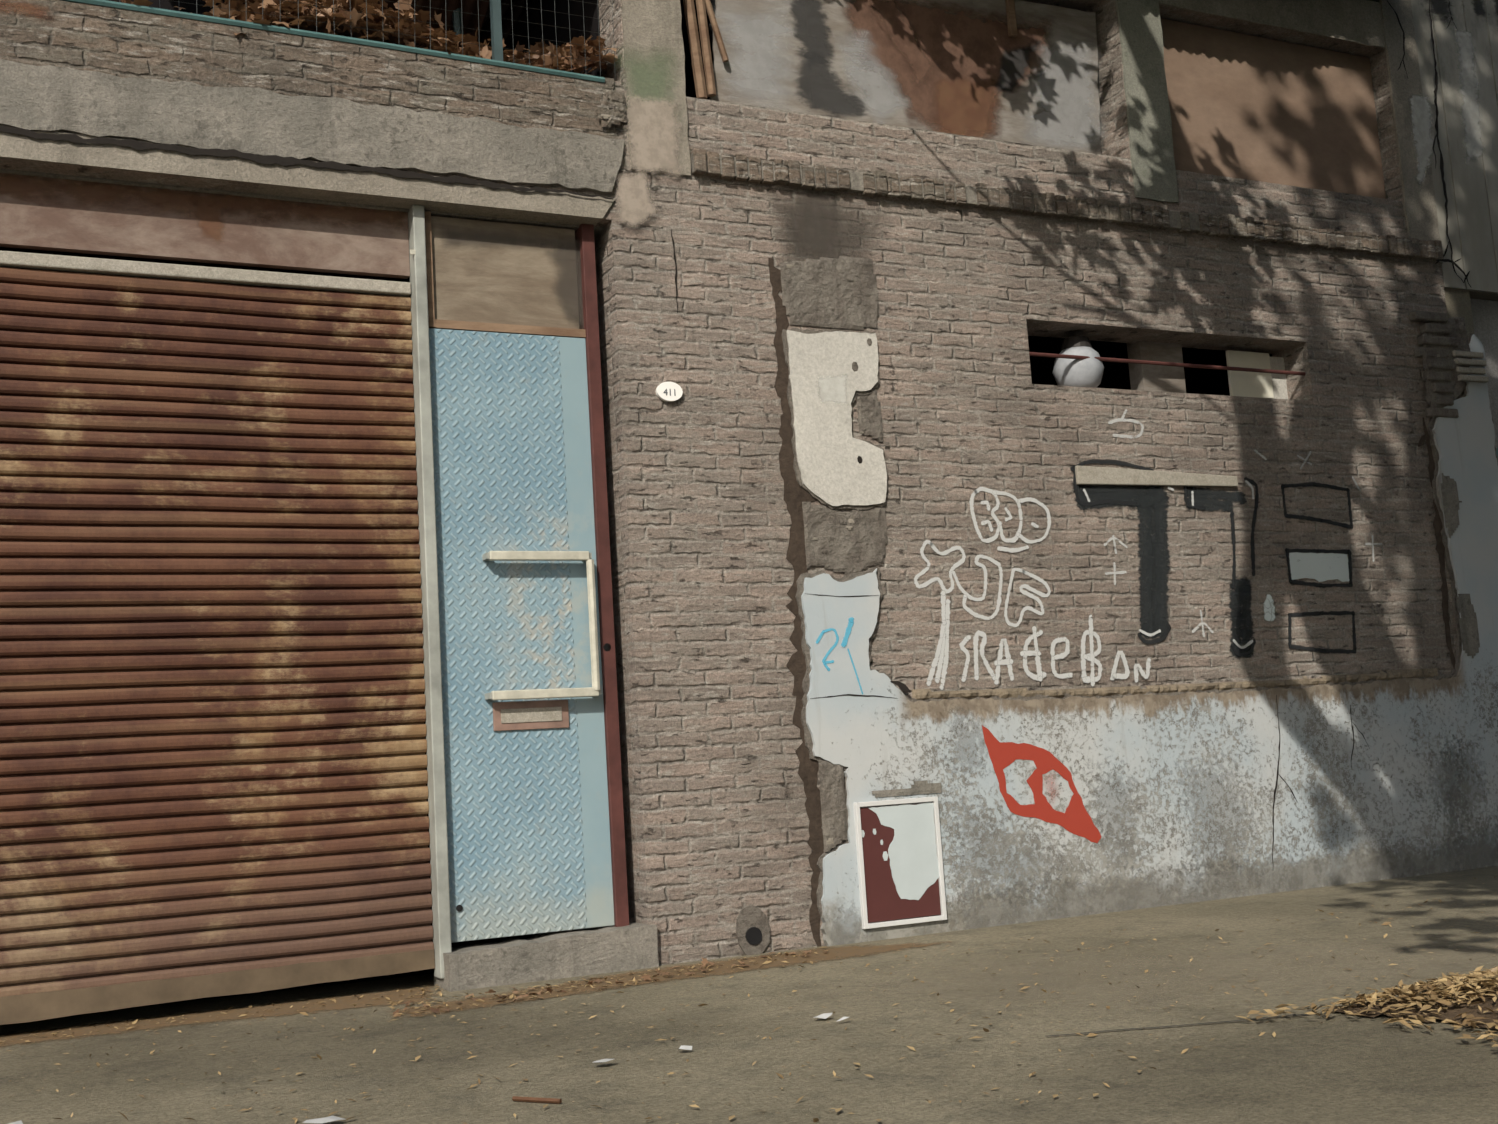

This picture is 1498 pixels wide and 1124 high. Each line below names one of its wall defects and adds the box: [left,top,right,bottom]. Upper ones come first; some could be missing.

flaking render [780,256,890,575]
peeling [818,761,942,900]
crack [1272,695,1298,862]